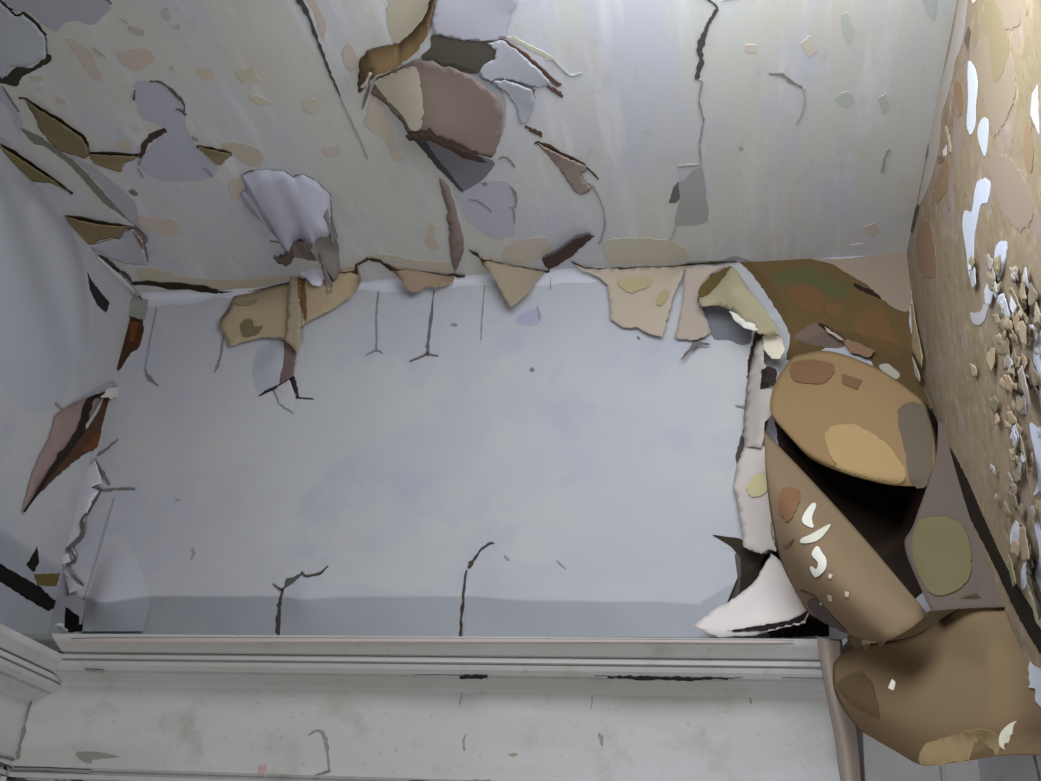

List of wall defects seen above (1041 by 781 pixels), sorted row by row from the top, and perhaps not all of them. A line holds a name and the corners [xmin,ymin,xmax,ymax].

peeling [0,0,112,87]
crack [296,0,370,159]
crack [678,0,727,167]
crack [769,72,805,124]
peeling [21,80,231,371]
peeling [219,0,550,384]
peeling [22,391,109,547]
crack [23,392,135,600]
flaking render [480,234,1041,653]
crack [273,565,328,635]
crack [459,542,510,636]
peeling [817,637,862,781]